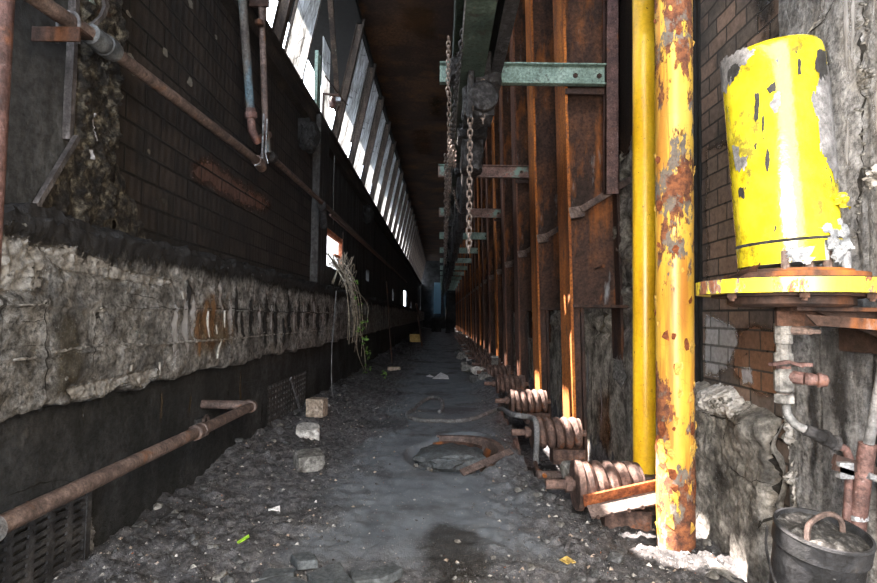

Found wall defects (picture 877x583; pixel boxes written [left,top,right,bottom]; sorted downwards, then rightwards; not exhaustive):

peeling [720,47,756,100]
peeling [770,91,781,113]
peeling [811,65,851,210]
crack [846,2,870,243]
spalling [0,233,179,294]
crack [17,301,49,396]
corrosion [193,295,235,355]
spalling [65,368,167,400]
crack [701,411,740,442]
crack [725,422,784,526]